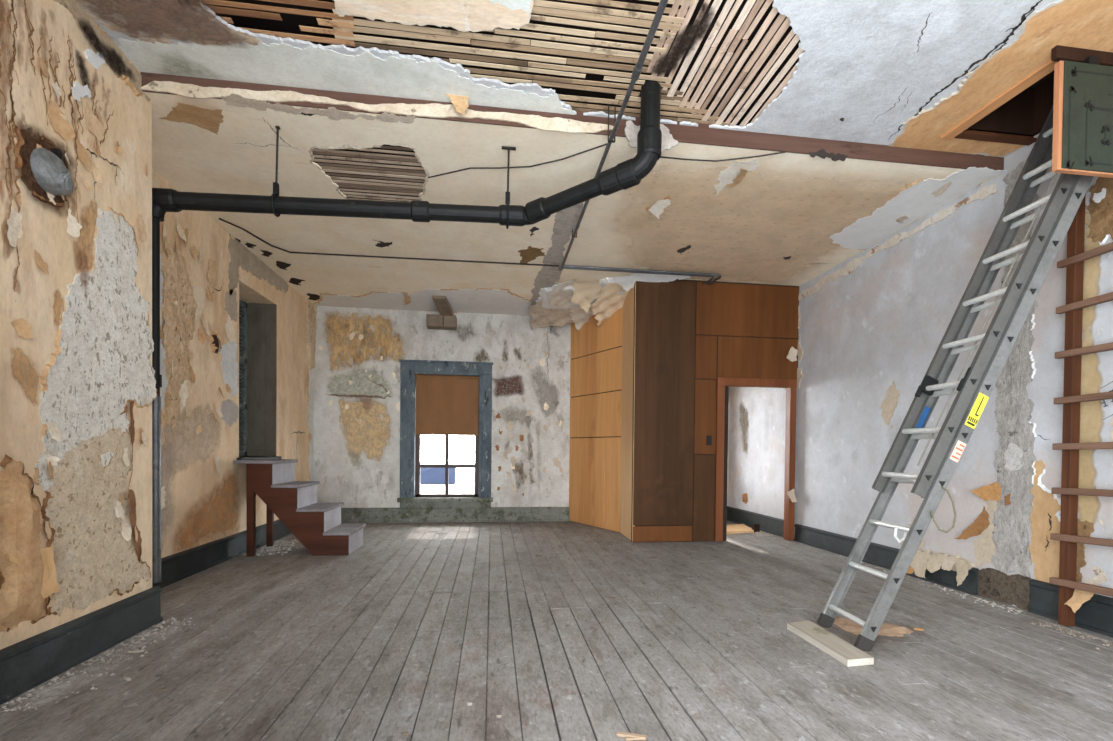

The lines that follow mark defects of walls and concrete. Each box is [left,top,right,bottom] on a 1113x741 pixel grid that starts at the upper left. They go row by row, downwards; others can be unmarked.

peeling [46,191,82,237]
peeling [38,56,122,173]
peeling [84,49,106,69]
damp [0,0,262,291]
flaking render [118,38,575,115]
flaking render [830,154,1030,250]
crack [873,0,1042,139]
spalling [1001,194,1039,298]
spalling [33,206,239,616]
flaking render [306,273,691,481]
spalling [991,301,1038,578]
peeling [907,553,969,586]